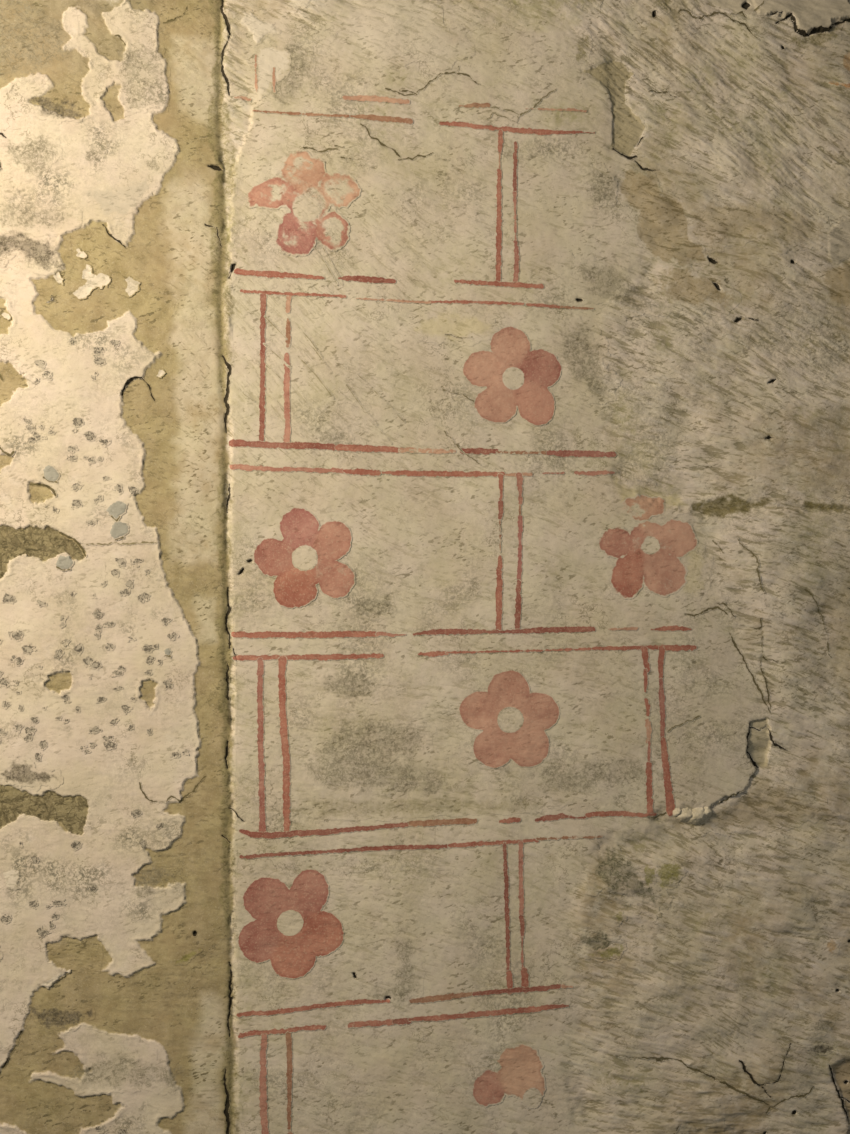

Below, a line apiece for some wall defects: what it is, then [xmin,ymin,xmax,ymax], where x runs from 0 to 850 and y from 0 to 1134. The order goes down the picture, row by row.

crack [220,0,232,96]
crack [677,0,850,41]
crack [204,223,232,279]
crack [221,355,232,433]
peeling [0,0,234,1134]
crack [224,587,238,701]
crack [684,537,787,806]
crack [804,588,833,658]
crack [221,807,245,844]
crack [226,961,234,1038]
crack [223,1068,231,1134]
crack [615,1042,850,1124]